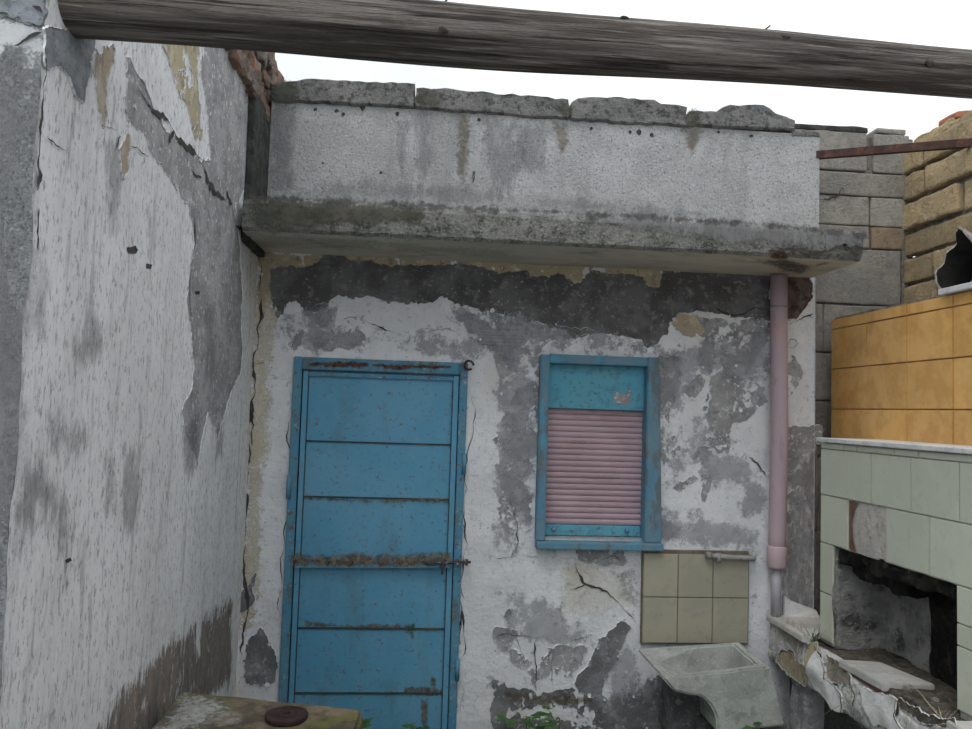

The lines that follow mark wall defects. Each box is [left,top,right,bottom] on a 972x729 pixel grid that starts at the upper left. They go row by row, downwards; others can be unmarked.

crack [0,6,43,46]
flaking render [0,0,249,467]
flaking render [788,277,815,321]
corrosion [310,361,451,370]
flaking render [256,252,770,534]
crack [239,257,264,654]
corrosion [292,552,452,568]
crack [497,500,636,622]
peeling [849,501,857,552]
leakage [97,598,251,729]
flaking render [489,608,661,729]
flaking render [776,641,958,729]